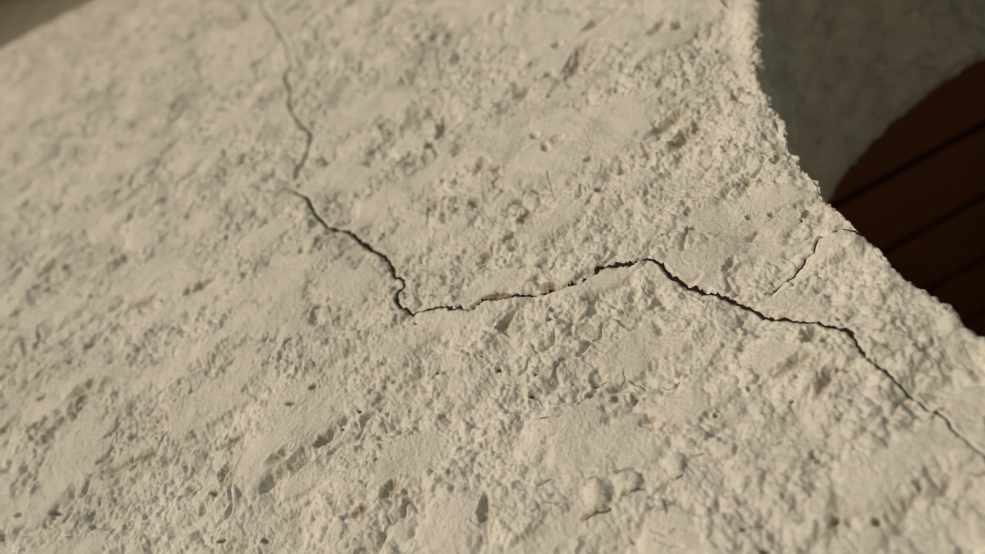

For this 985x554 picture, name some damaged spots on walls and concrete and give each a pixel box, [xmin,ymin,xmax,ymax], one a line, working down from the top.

crack [261,0,985,477]
crack [584,468,672,547]